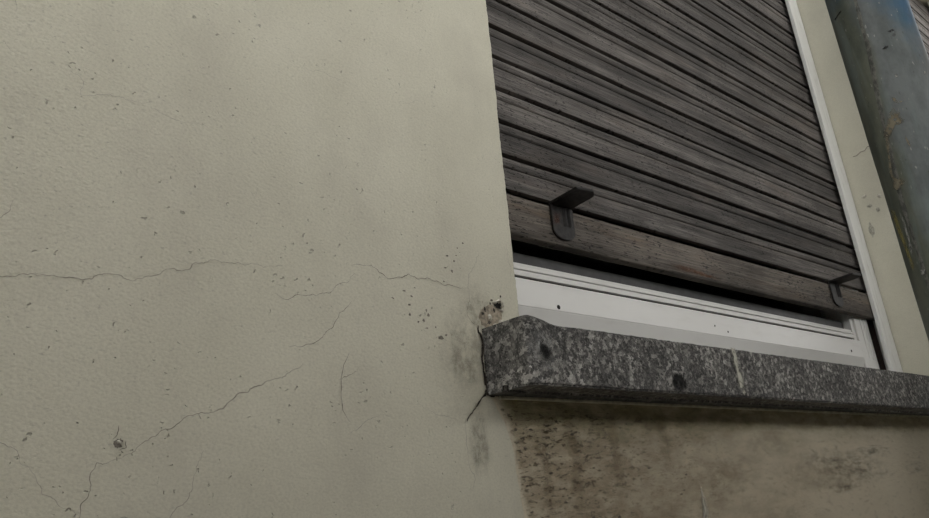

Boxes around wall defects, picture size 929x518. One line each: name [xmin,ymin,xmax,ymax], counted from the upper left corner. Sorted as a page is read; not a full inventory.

spalling [479,295,506,327]
crack [0,256,499,518]
damp [508,411,601,503]